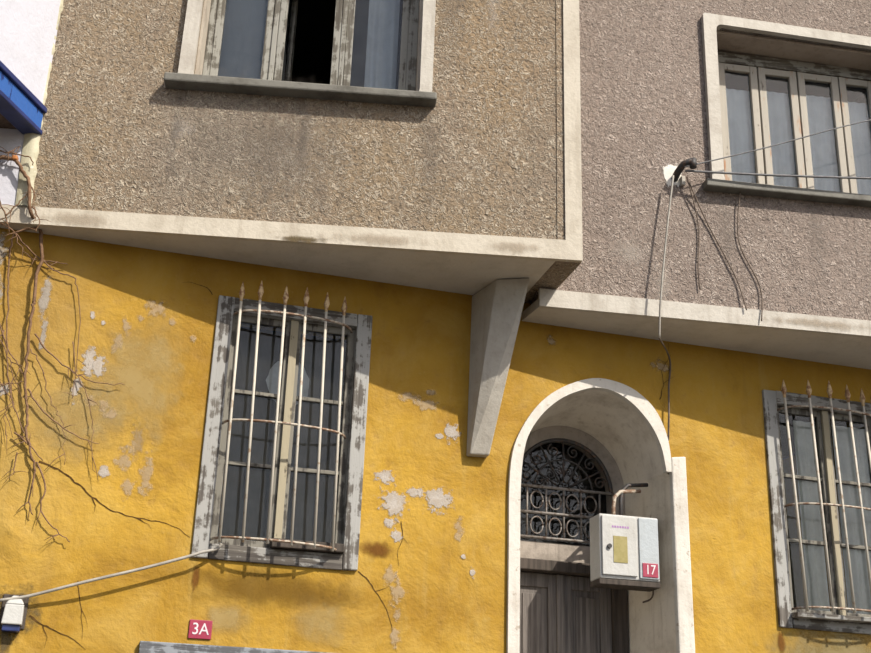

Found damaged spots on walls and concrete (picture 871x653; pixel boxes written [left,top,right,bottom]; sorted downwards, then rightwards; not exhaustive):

peeling [39,280,51,349]
peeling [139,301,175,325]
flaking render [71,319,130,405]
peeling [98,431,153,495]
peeling [402,390,436,410]
peeling [435,424,461,445]
flaking render [374,470,453,542]
peeling [384,568,405,648]